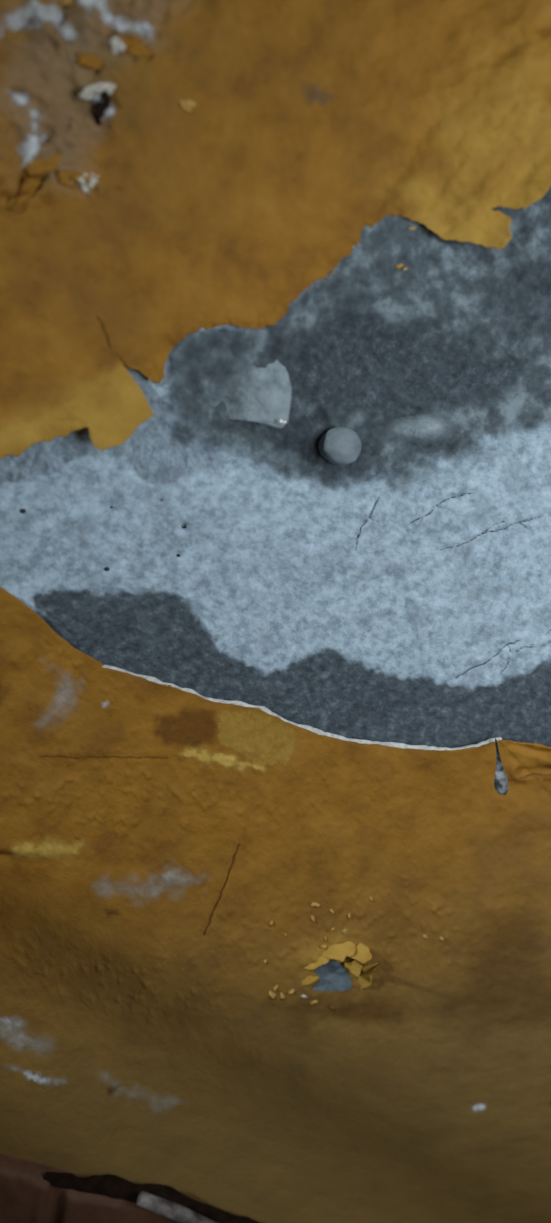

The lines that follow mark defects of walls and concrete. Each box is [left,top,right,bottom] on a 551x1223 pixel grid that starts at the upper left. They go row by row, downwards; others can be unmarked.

peeling [0,0,152,125]
peeling [6,93,99,211]
peeling [398,74,551,249]
peeling [194,325,254,334]
peeling [0,349,551,691]
crack [442,517,536,550]
crack [460,630,551,676]
peeling [102,665,508,795]
spalling [269,902,380,1011]